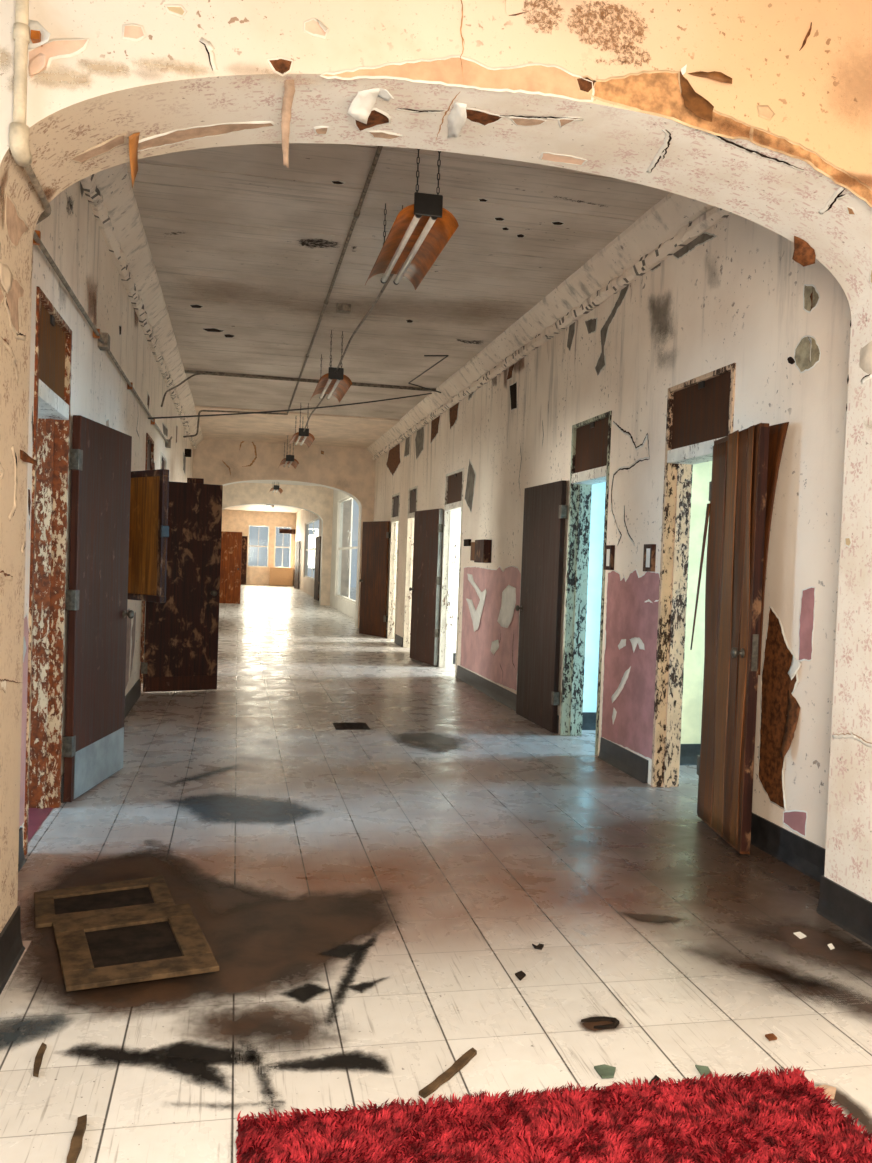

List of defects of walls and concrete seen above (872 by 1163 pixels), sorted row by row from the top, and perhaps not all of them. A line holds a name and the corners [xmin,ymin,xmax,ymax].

peeling [27,20,90,81]
crack [396,0,465,142]
water stain [524,0,651,66]
peeling [319,55,872,215]
crack [646,130,672,174]
crack [706,133,804,172]
peeling [650,232,717,272]
peeling [792,236,816,267]
peeling [19,613,30,828]
peeling [460,566,521,691]
peeling [601,569,660,760]
peeling [758,586,816,837]